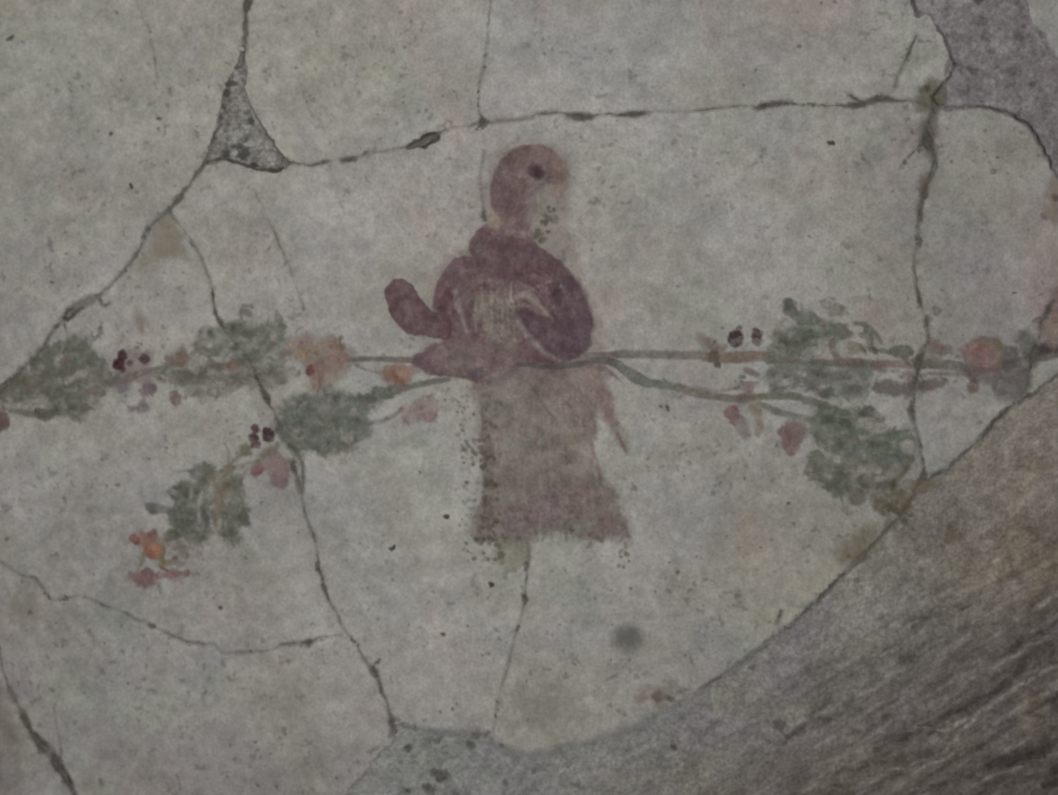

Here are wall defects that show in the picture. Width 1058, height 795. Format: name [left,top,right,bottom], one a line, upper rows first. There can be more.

crack [242,0,251,61]
flaking render [203,46,291,173]
crack [540,111,647,119]
crack [694,95,905,111]
flaking render [910,0,1058,177]
crack [119,160,209,276]
crack [0,294,109,393]
crack [211,289,303,485]
crack [903,100,942,477]
crack [304,510,331,605]
flaking render [347,373,1058,795]
crack [21,715,76,795]